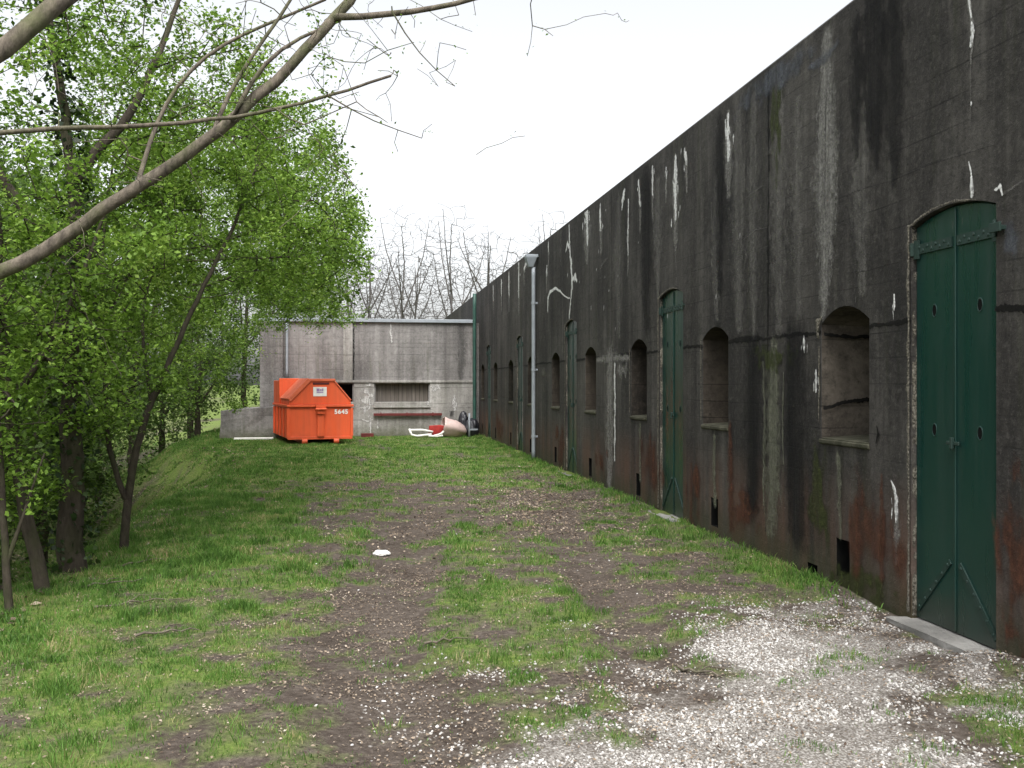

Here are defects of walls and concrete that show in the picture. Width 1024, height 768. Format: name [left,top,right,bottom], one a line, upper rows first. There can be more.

leakage [851,0,904,199]
leakage [546,231,577,319]
leakage [582,203,603,263]
leakage [615,148,688,318]
leakage [714,111,819,544]
leakage [891,481,899,549]